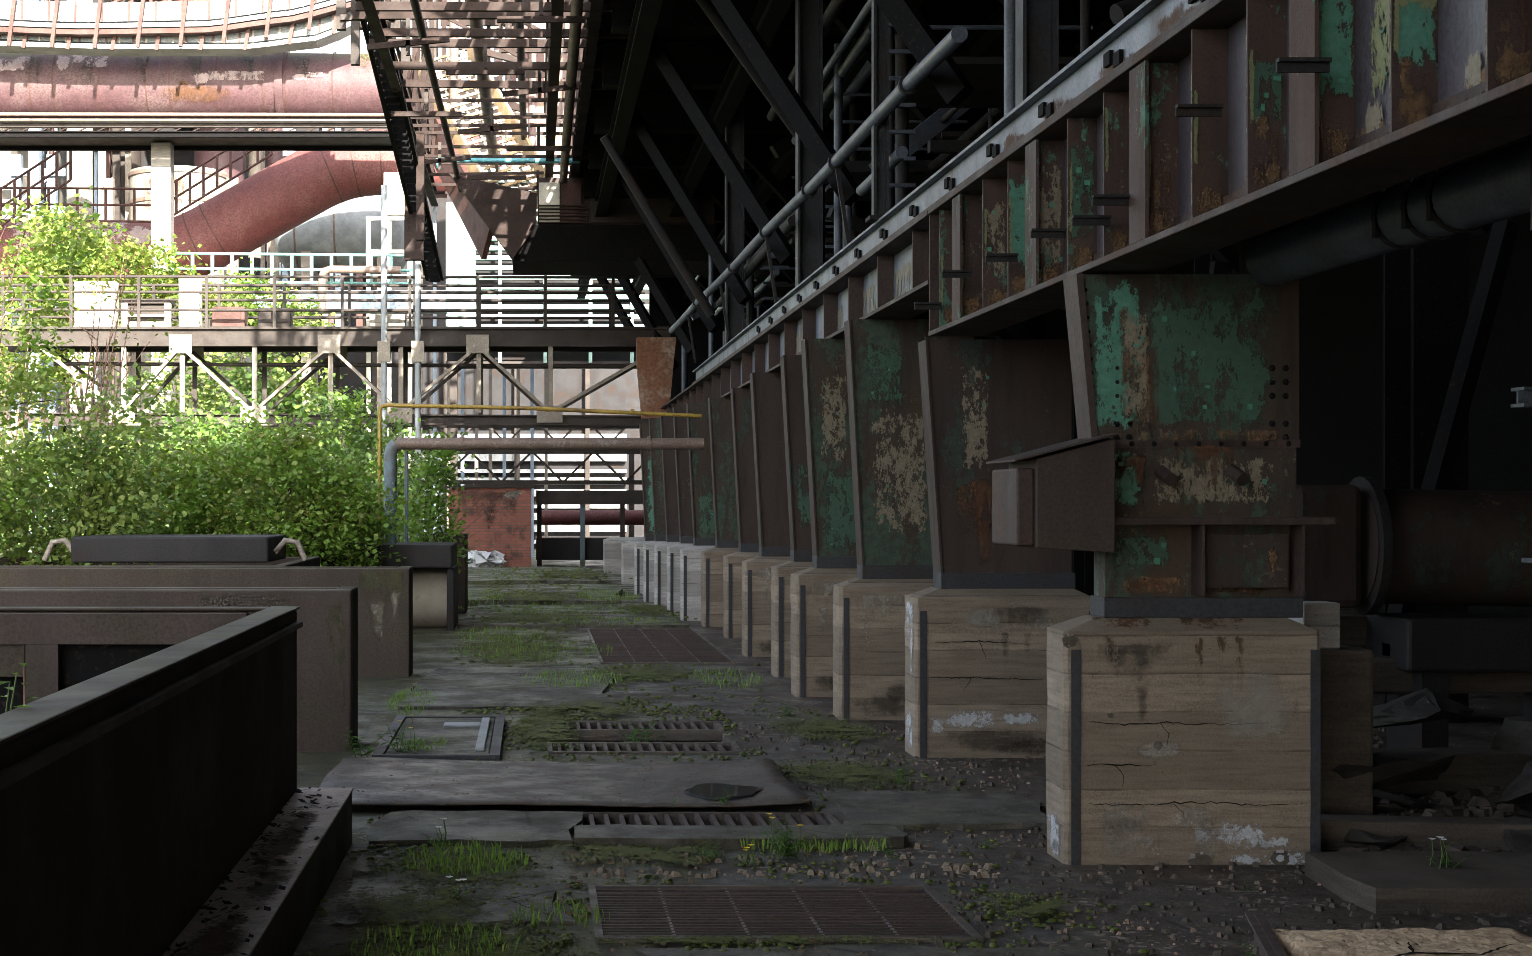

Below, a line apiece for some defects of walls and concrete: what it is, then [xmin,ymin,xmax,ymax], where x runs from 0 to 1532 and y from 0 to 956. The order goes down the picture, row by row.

peeling [1319,0,1438,158]
peeling [797,343,928,550]
crack [1395,942,1512,956]